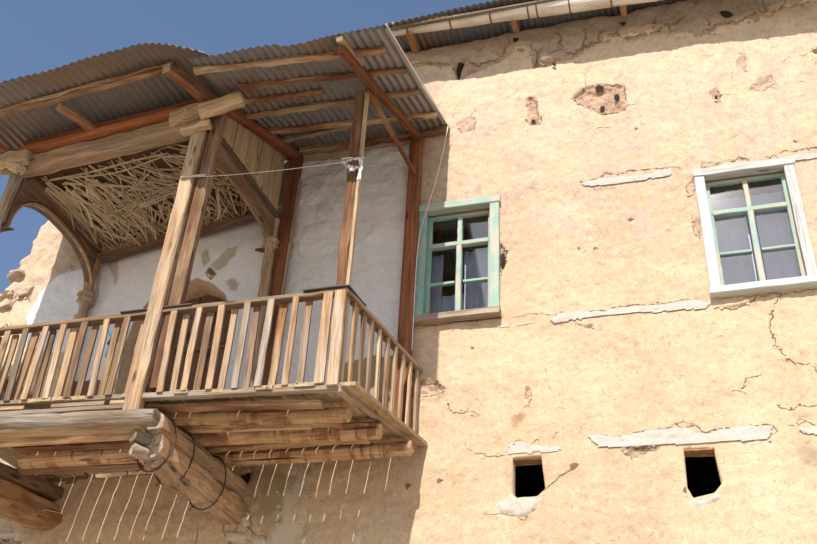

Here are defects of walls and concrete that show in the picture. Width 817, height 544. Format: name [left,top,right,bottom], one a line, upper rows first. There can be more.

spalling [404,0,809,79]
spalling [525,94,543,126]
spalling [571,80,637,115]
spalling [750,74,777,92]
crack [714,289,815,365]
spalling [418,377,446,397]
crack [464,430,563,457]
crack [602,401,817,450]
peeling [250,466,309,544]
crack [482,469,571,520]